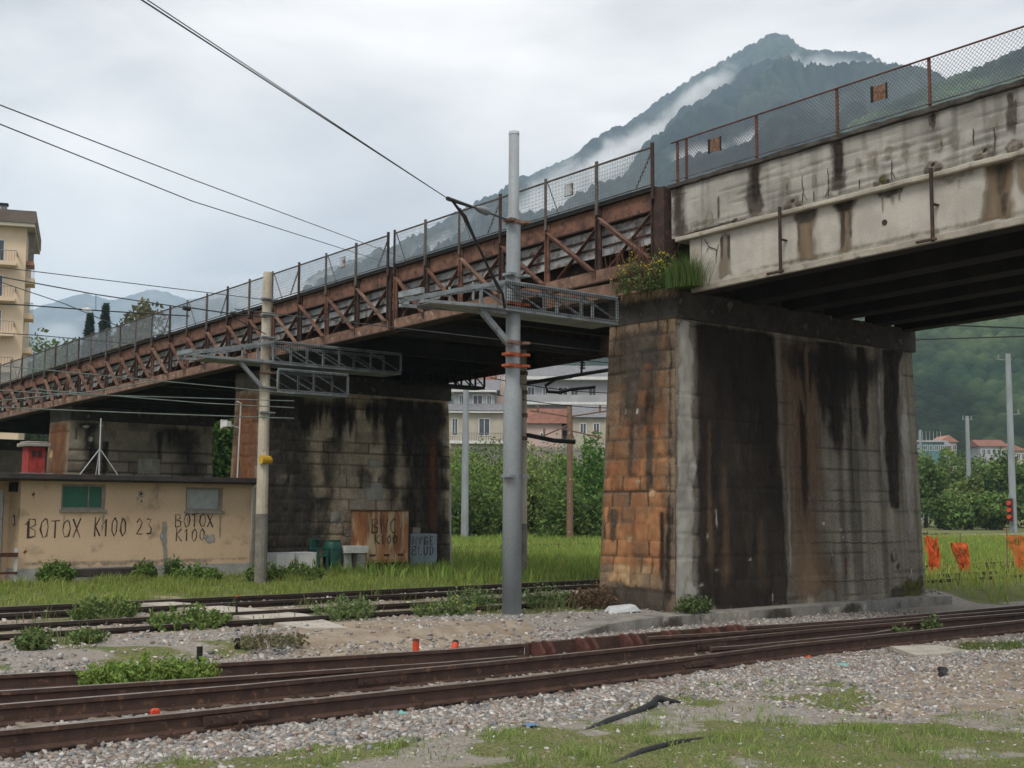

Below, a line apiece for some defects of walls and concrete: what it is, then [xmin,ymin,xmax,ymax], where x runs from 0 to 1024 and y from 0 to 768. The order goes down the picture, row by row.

leakage [991,93,1017,131]
leakage [746,164,764,216]
leakage [794,209,815,260]
leakage [830,140,853,252]
leakage [943,159,1024,222]
leakage [267,391,450,566]
corrosion [602,408,667,586]
leakage [696,324,902,619]